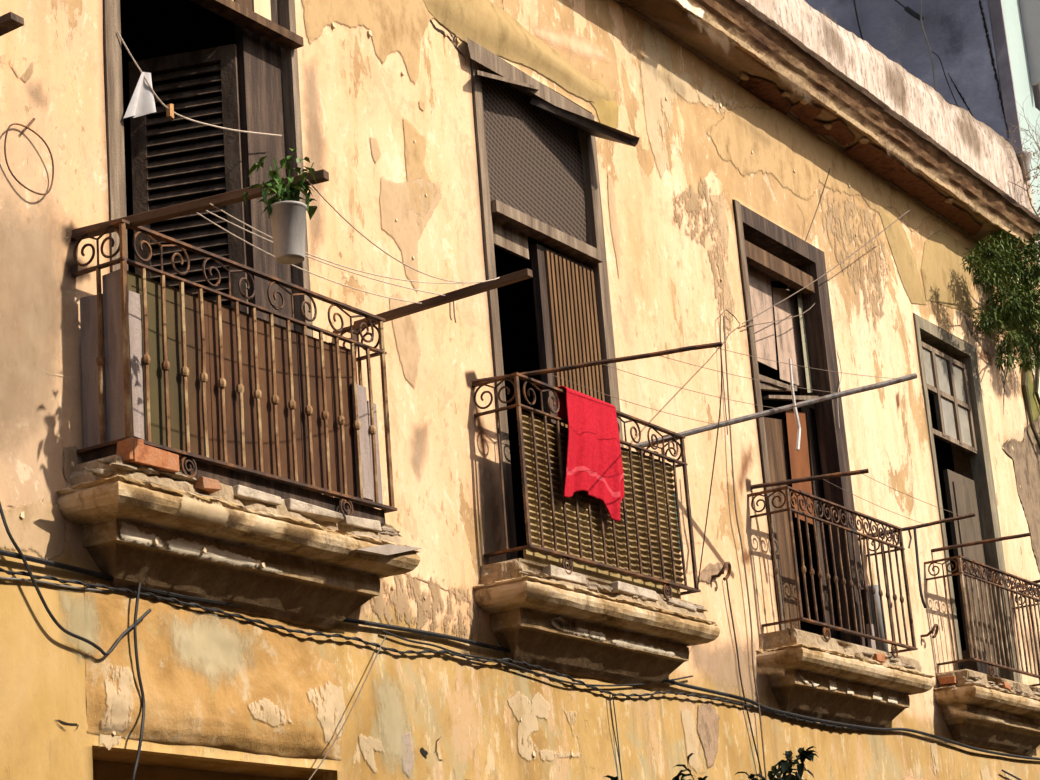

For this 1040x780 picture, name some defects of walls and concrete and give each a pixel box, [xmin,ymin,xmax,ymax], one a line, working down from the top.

spalling [302,0,619,129]
peeling [370,137,381,163]
peeling [380,118,442,292]
peeling [390,292,421,388]
spalling [371,573,481,643]
peeling [99,665,135,750]
peeling [249,697,292,726]
peeling [307,681,346,744]
peeling [359,679,415,778]
peeling [508,691,580,761]